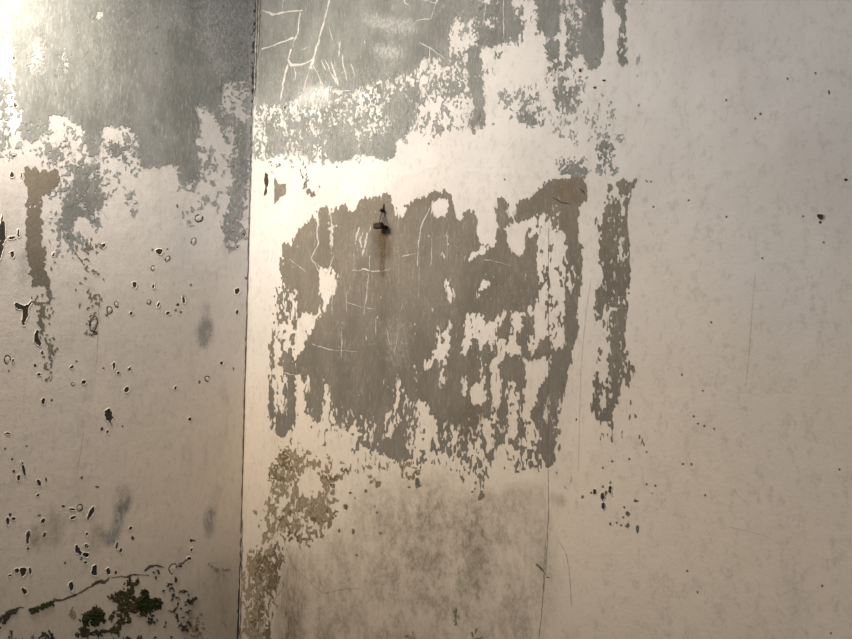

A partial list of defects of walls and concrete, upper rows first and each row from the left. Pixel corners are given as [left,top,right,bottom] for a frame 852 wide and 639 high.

peeling [0,0,652,639]
crack [0,559,188,623]
damp [162,577,198,639]